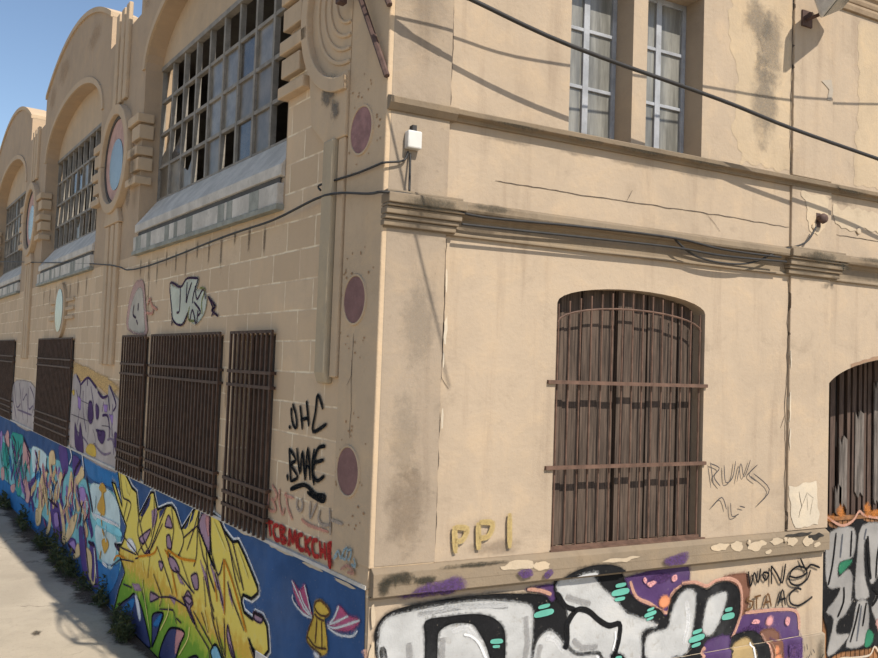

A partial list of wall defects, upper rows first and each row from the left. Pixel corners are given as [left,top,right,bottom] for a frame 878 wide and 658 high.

crack [495,180,784,231]
crack [781,284,813,529]
spalling [501,560,550,571]
spalling [711,532,824,554]